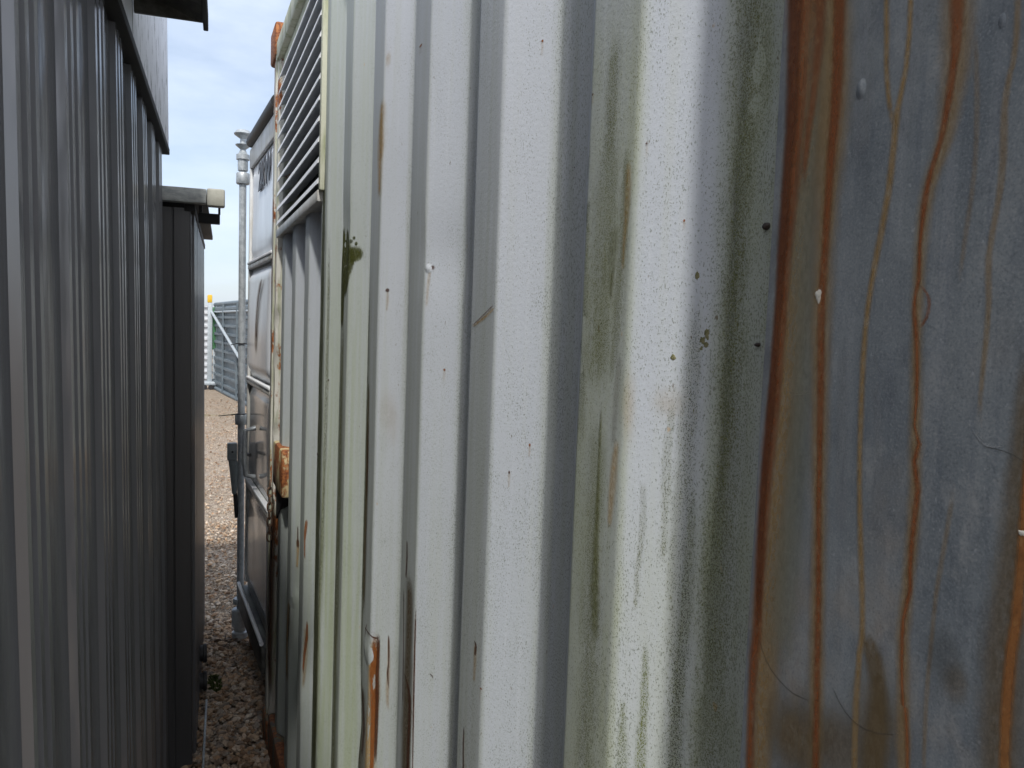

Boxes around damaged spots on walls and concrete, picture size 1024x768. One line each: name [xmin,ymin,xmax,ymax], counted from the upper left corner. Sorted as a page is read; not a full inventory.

corrosion [747,0,846,768]
corrosion [899,0,967,768]
corrosion [363,625,389,768]
corrosion [402,551,416,768]
corrosion [989,406,1024,768]